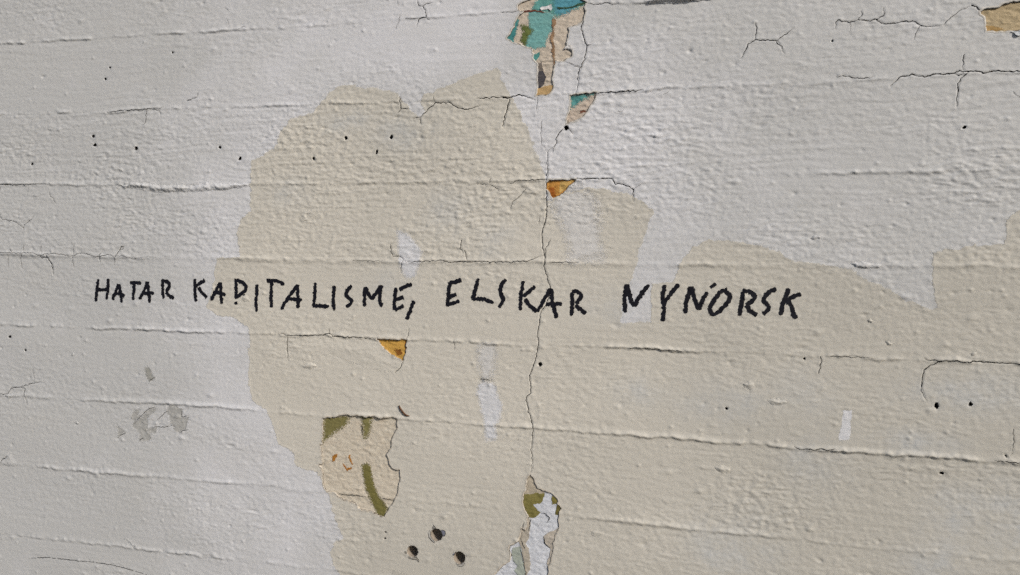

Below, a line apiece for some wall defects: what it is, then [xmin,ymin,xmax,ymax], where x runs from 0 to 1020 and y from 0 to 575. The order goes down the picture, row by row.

peeling [505,0,588,97]
crack [565,2,642,112]
crack [742,25,788,57]
crack [835,5,980,39]
crack [839,54,1020,105]
peeling [565,91,598,125]
peeling [544,177,577,200]
crack [580,178,641,196]
crack [353,94,576,466]
peeling [376,337,408,362]
peeling [318,413,401,518]
peeling [491,473,562,575]